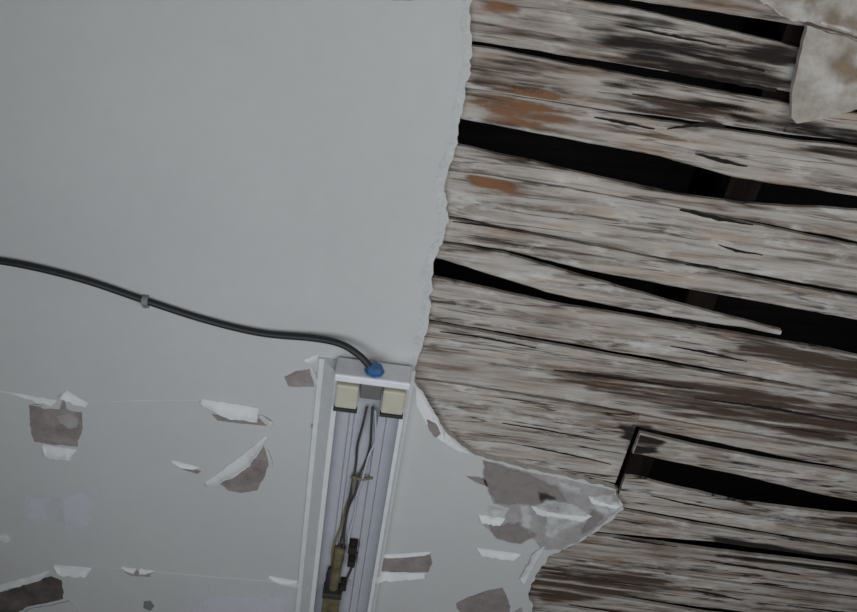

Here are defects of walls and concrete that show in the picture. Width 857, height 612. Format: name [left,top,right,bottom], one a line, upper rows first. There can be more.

flaking render [761,0,857,124]
peeling [406,0,470,367]
peeling [284,354,319,387]
peeling [11,390,89,461]
peeling [200,399,273,426]
peeling [414,384,469,454]
peeling [171,437,273,493]
peeling [466,460,623,585]
peeling [0,565,91,612]
peeling [456,588,523,612]